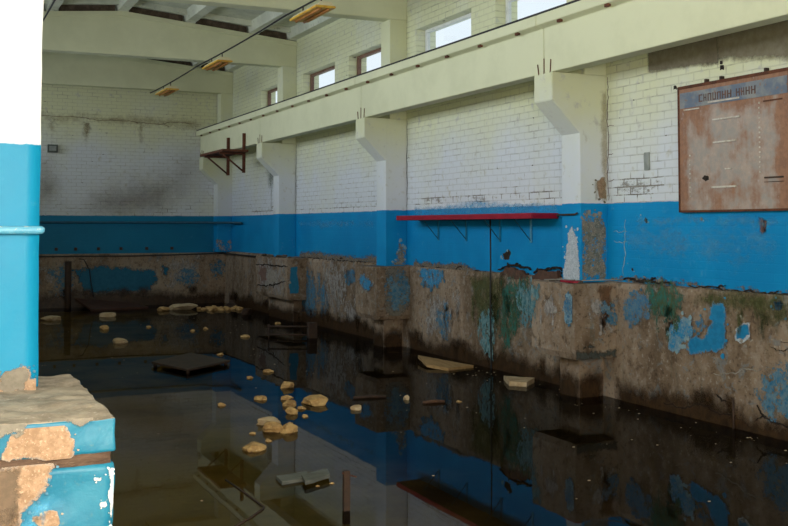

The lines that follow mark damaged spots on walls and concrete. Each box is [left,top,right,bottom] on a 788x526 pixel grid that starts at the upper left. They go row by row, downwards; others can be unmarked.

water stain [648,20,788,72]
peeling [48,264,200,296]
flaking render [287,250,377,317]
peeling [384,238,476,311]
flaking render [489,176,766,359]
peeling [477,305,497,360]
flaking render [14,364,37,391]
water stain [616,384,788,451]
peeling [754,360,788,422]
peeling [0,418,94,526]
spalling [94,467,115,526]